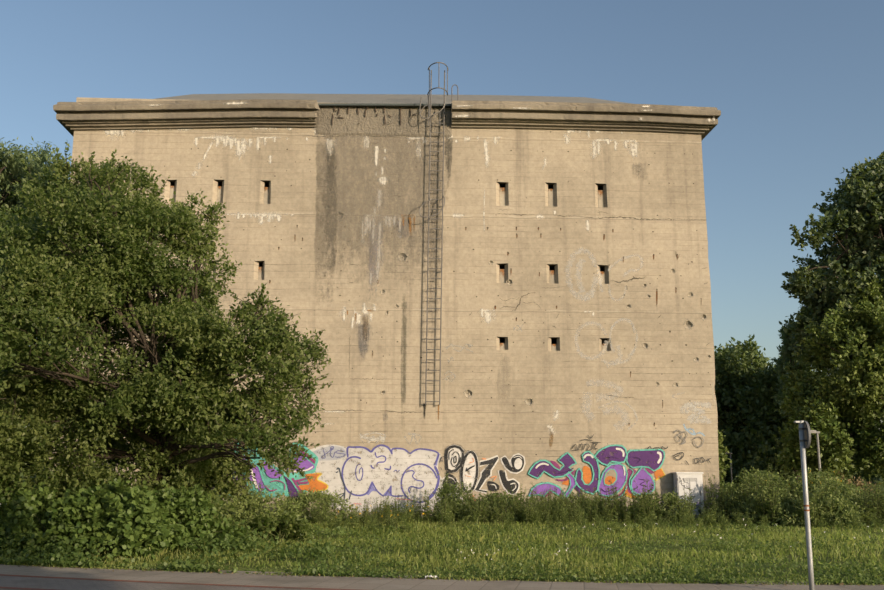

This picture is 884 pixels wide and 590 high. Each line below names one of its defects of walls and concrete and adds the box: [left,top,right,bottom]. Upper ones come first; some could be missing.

leakage [169,127,276,176]
leakage [565,130,637,157]
leakage [327,136,500,285]
leakage [343,303,376,354]